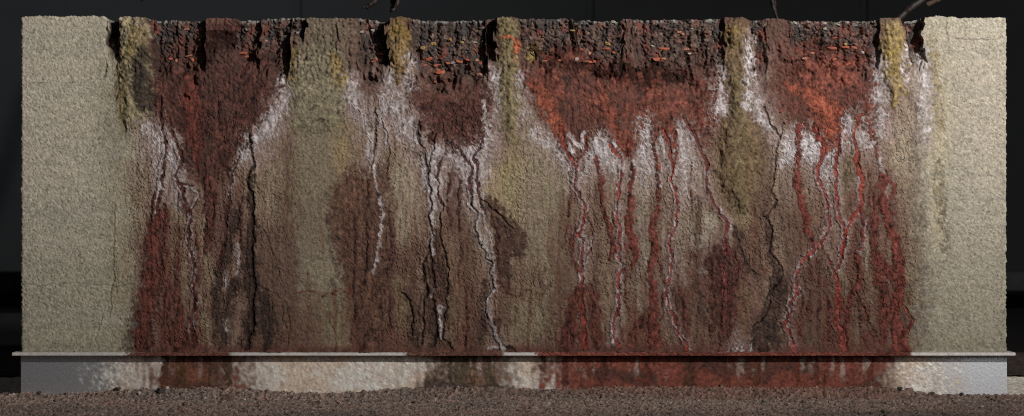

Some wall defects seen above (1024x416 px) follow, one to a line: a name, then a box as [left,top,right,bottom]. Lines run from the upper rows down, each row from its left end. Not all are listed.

spalling [518,18,726,82]
spalling [788,20,880,69]
spalling [901,18,923,62]
water stain [93,296,173,391]
corrosion [132,21,289,389]
crack [245,134,255,349]
water stain [210,23,575,393]
crack [403,125,451,347]
corrosion [406,79,527,300]
corrosion [501,25,914,390]
water stain [529,25,935,373]
crack [752,107,783,327]